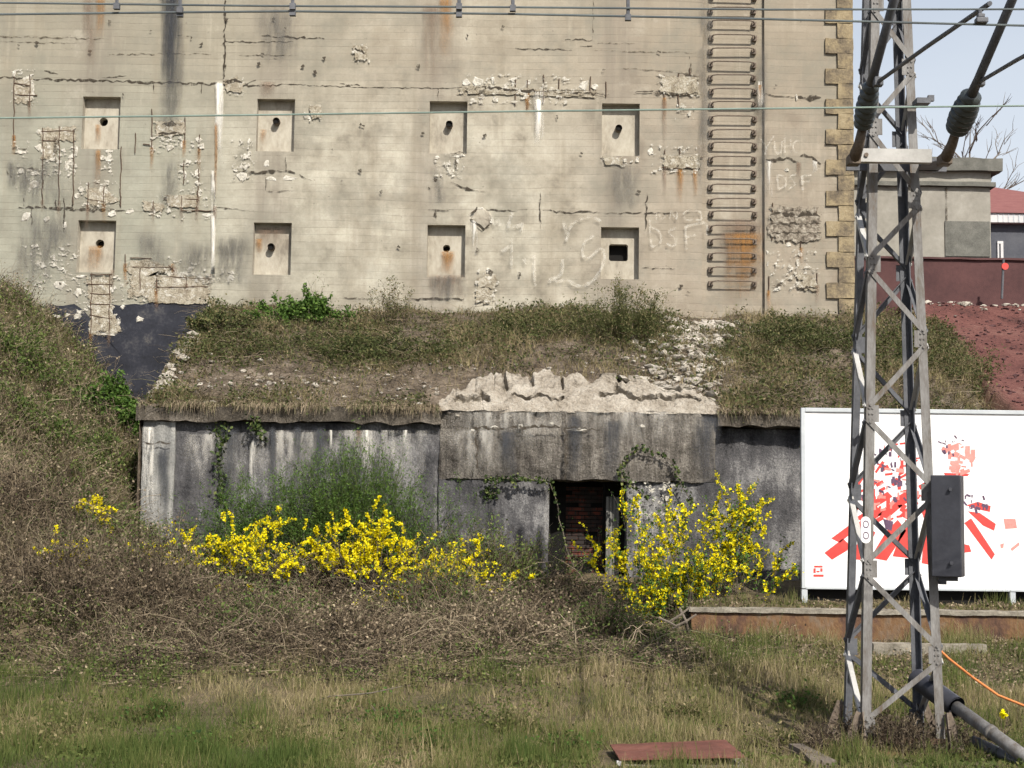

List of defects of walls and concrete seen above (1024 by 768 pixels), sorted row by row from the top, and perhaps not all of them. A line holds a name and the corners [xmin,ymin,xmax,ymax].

damp [165,0,180,72]
crack [0,0,456,93]
spalling [457,69,609,119]
spalling [635,68,701,119]
spalling [6,68,122,211]
spalling [135,109,216,220]
spalling [766,203,822,295]
peeling [21,241,235,402]
spalling [439,369,718,414]
damp [144,427,168,494]
damp [262,428,301,466]
damp [316,429,332,471]